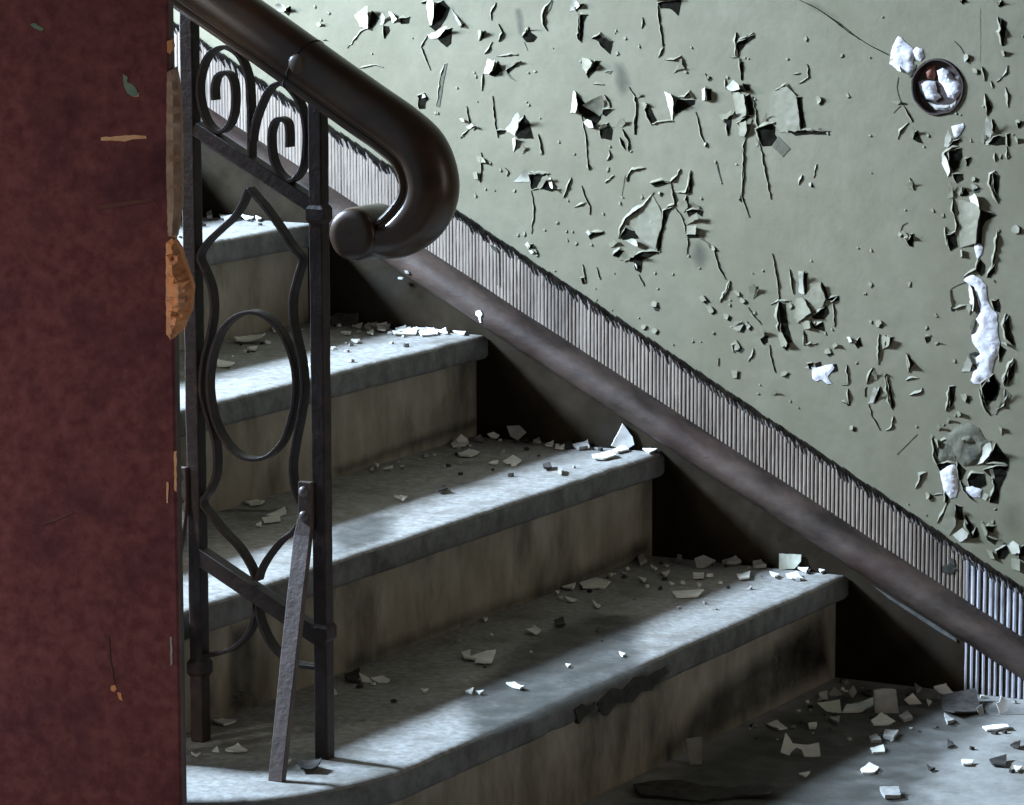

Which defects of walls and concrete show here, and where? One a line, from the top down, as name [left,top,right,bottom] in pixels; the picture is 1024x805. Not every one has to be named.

peeling [347,6,410,48]
peeling [417,0,465,115]
peeling [460,0,553,154]
peeling [570,0,641,169]
peeling [657,0,693,74]
peeling [641,32,829,199]
spalling [889,36,924,77]
peeling [473,152,704,290]
peeling [748,253,862,384]
peeling [855,319,894,431]
spalling [931,93,1024,571]
peeling [592,424,634,460]